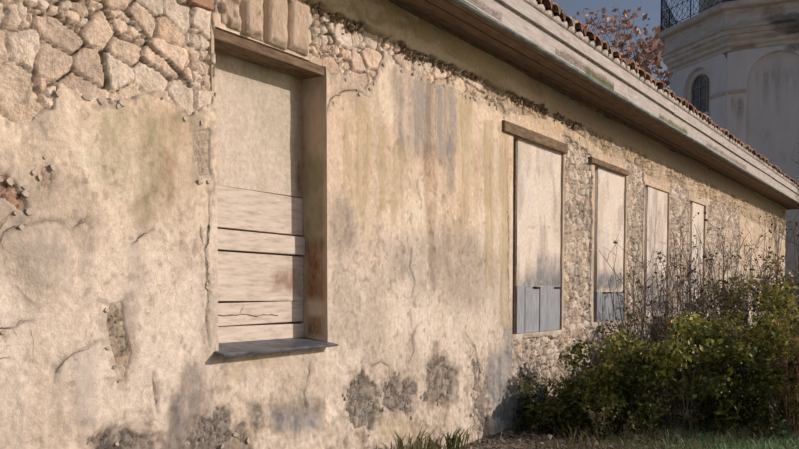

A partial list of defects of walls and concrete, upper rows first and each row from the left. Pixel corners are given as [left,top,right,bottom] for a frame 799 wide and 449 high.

spalling [0,0,220,122]
spalling [0,155,56,215]
crack [0,175,87,249]
spalling [191,120,211,184]
leakage [414,81,471,225]
spalling [309,4,785,398]
crack [199,201,278,346]
spalling [104,302,130,383]
spalling [343,357,452,436]